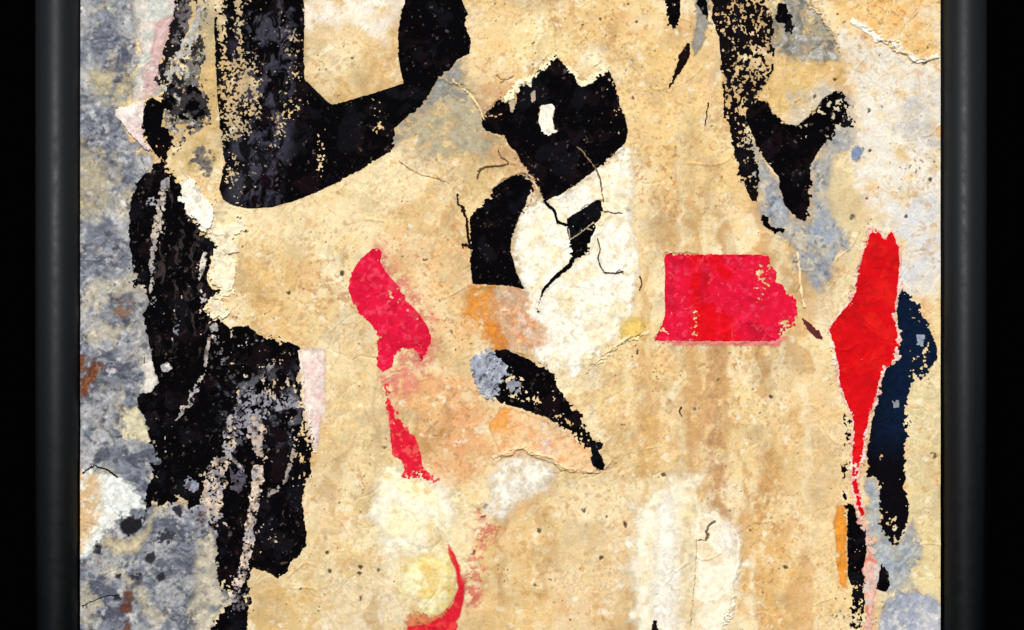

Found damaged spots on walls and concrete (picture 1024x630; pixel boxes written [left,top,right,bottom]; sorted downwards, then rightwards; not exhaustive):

crack [399,146,642,312]